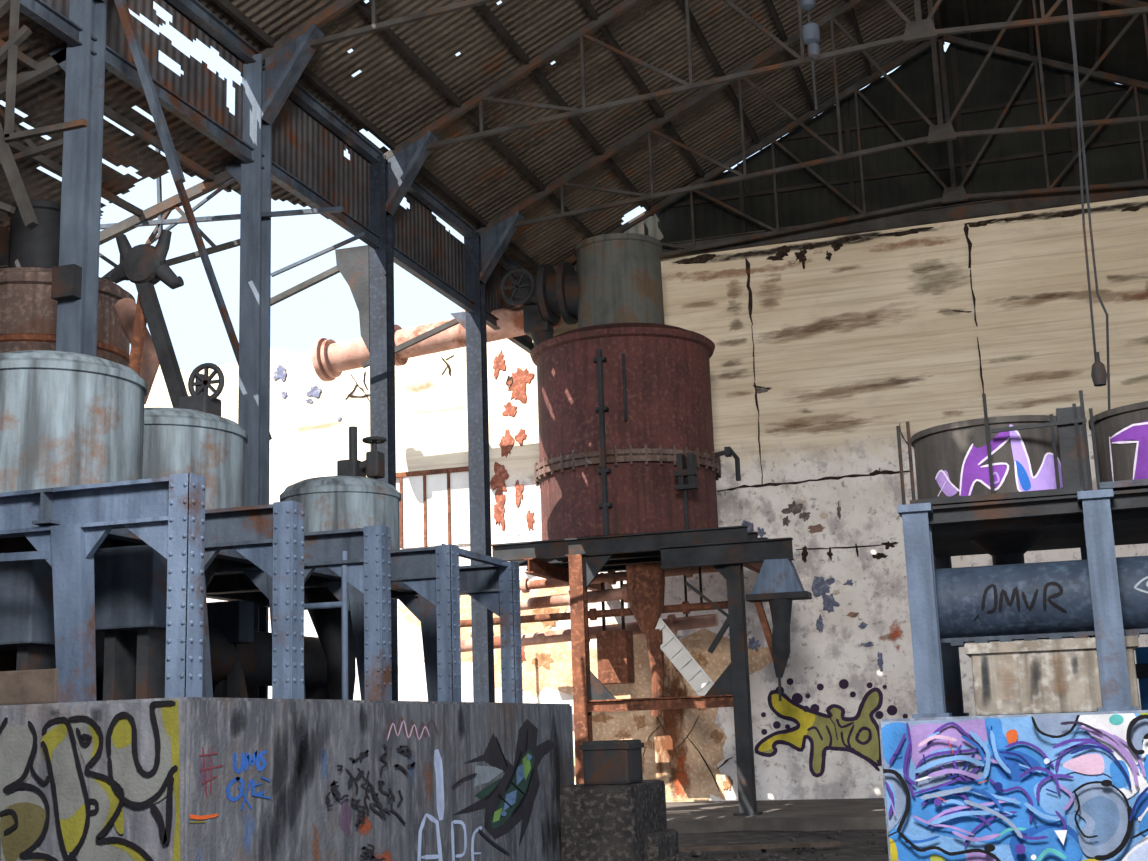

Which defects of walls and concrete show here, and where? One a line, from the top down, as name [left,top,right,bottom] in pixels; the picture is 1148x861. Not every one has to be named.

crack [953,224,984,394]
peeling [490,350,535,532]
spalling [781,499,841,534]
peeling [589,628,733,802]
corrosion [655,659,689,796]
peeling [747,637,773,675]
spalling [811,576,883,671]